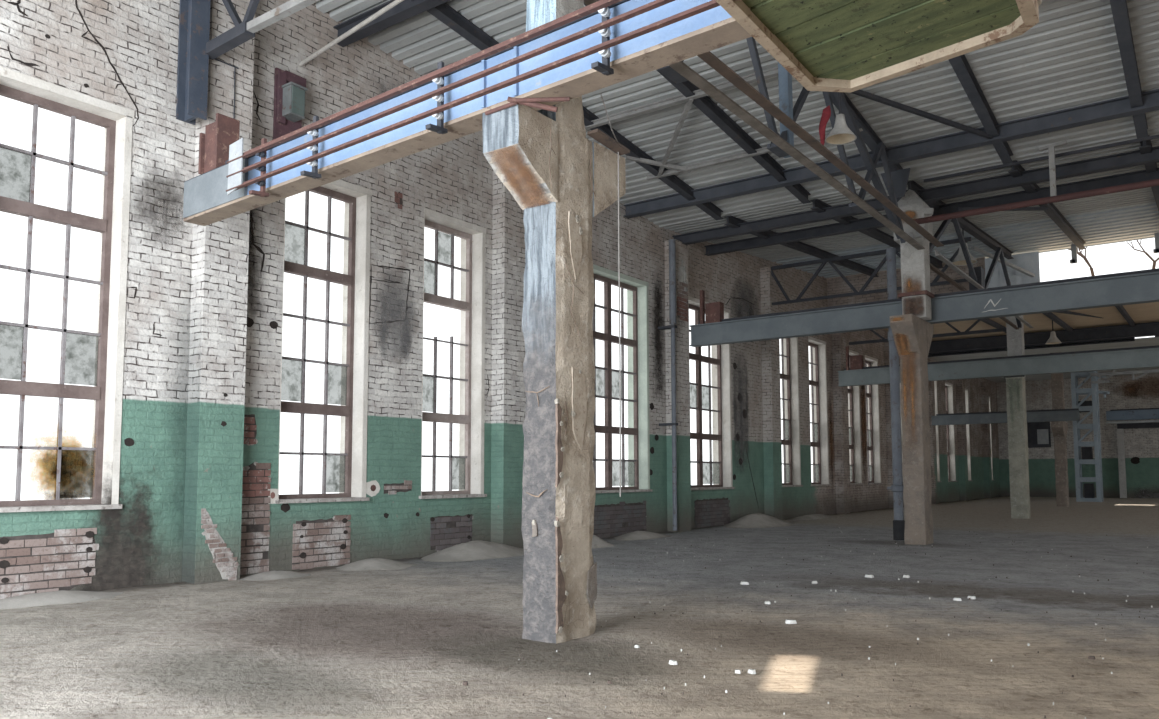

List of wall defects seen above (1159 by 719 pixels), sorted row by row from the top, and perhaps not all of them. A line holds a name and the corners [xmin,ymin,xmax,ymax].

crack [75,0,139,126]
water stain [380,284,412,353]
flaking render [244,414,258,446]
flaking render [0,528,99,600]
water stain [102,488,120,528]
flaking render [201,462,351,581]
flaking render [416,512,473,552]
spalling [554,517,569,633]
spalling [587,562,597,608]